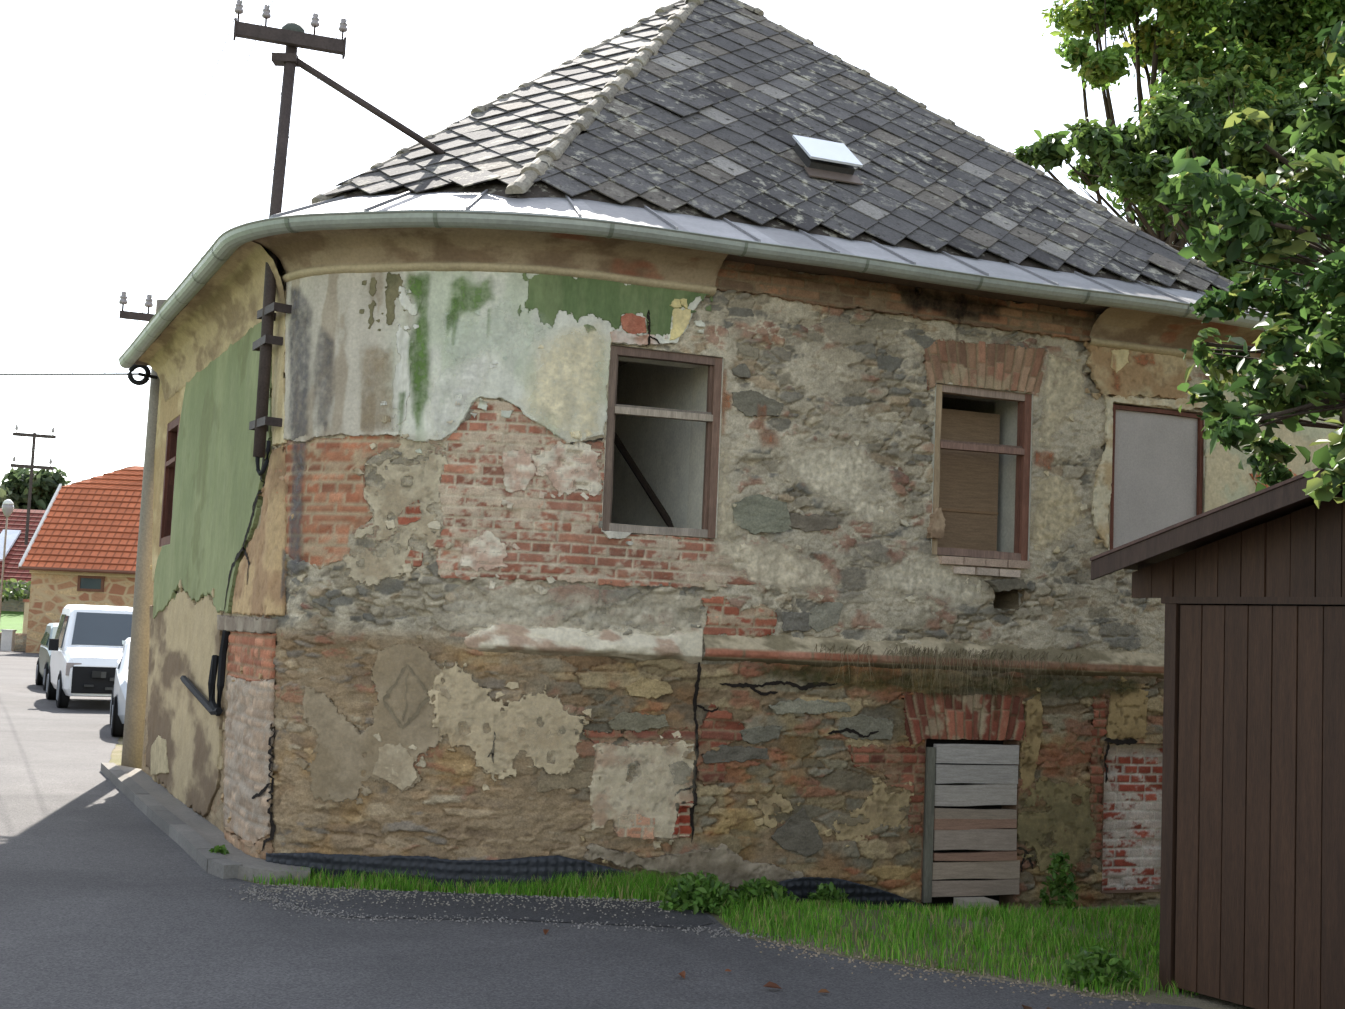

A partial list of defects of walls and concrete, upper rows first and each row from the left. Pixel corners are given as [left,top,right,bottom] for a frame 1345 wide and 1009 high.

flaking render [146,271,831,817]
crack [252,728,275,852]
flaking render [294,635,746,850]
crack [675,662,837,843]
flaking render [747,791,801,829]
spalling [823,744,925,847]
flaking render [1015,676,1149,877]